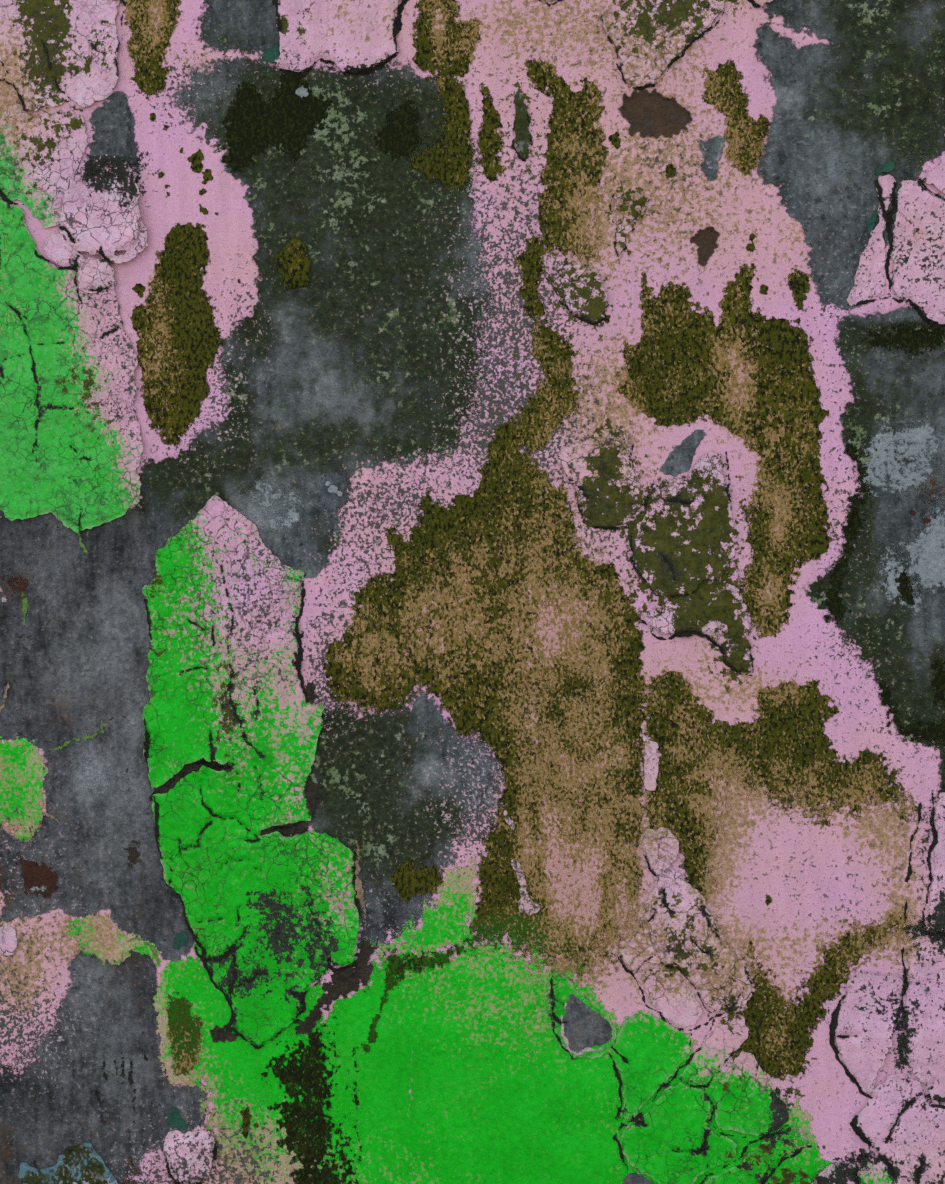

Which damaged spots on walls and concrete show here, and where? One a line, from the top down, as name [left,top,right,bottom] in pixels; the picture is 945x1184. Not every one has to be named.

peeling [514,93,530,159]
crack [607,0,761,90]
crack [34,226,113,304]
crack [855,178,945,329]
crack [0,302,73,462]
peeling [0,0,515,1184]
peeling [547,0,945,1184]
crack [144,565,359,1049]
peeling [511,859,540,915]
crack [900,792,945,1013]
crack [609,854,812,1184]
crack [829,992,945,1184]